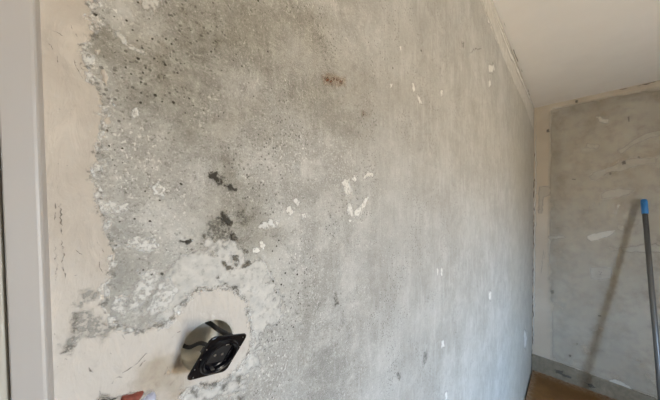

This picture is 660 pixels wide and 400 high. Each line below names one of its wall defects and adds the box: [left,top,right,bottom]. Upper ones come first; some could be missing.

leakage [209,172,237,191]
flaking render [40,0,255,400]
leakage [203,212,246,240]